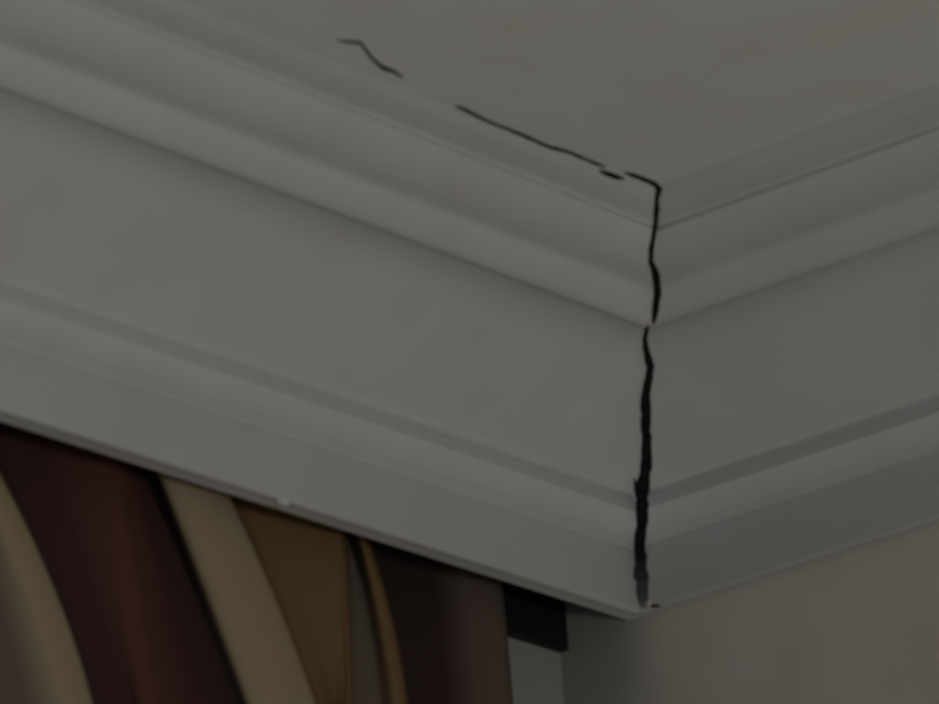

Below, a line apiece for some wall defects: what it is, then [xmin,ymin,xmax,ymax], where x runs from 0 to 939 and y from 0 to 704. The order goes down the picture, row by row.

crack [337,39,403,78]
crack [455,105,662,608]